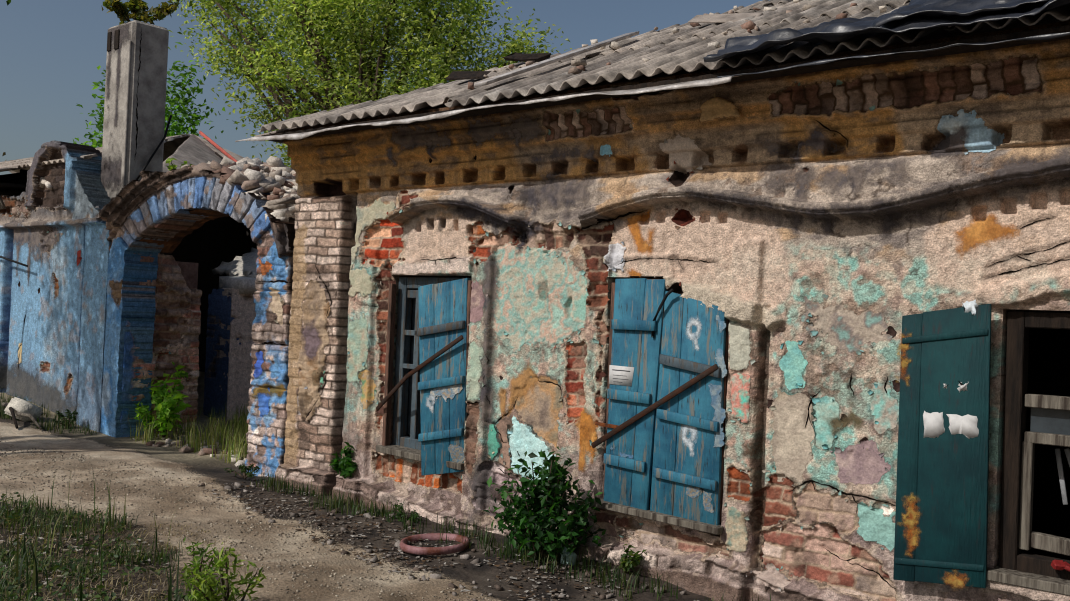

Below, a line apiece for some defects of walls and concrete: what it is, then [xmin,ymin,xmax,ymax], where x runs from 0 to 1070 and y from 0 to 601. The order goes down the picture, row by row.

spalling [769,54,1043,155]
leakage [684,127,961,236]
leakage [979,149,1070,188]
crack [986,218,1070,279]
peeling [259,259,284,326]
spalling [346,190,418,429]
peeling [372,221,626,523]
corrosion [896,334,911,384]
spalling [592,294,899,601]
crack [789,480,894,513]
corrosion [902,495,919,555]
crack [825,548,896,591]